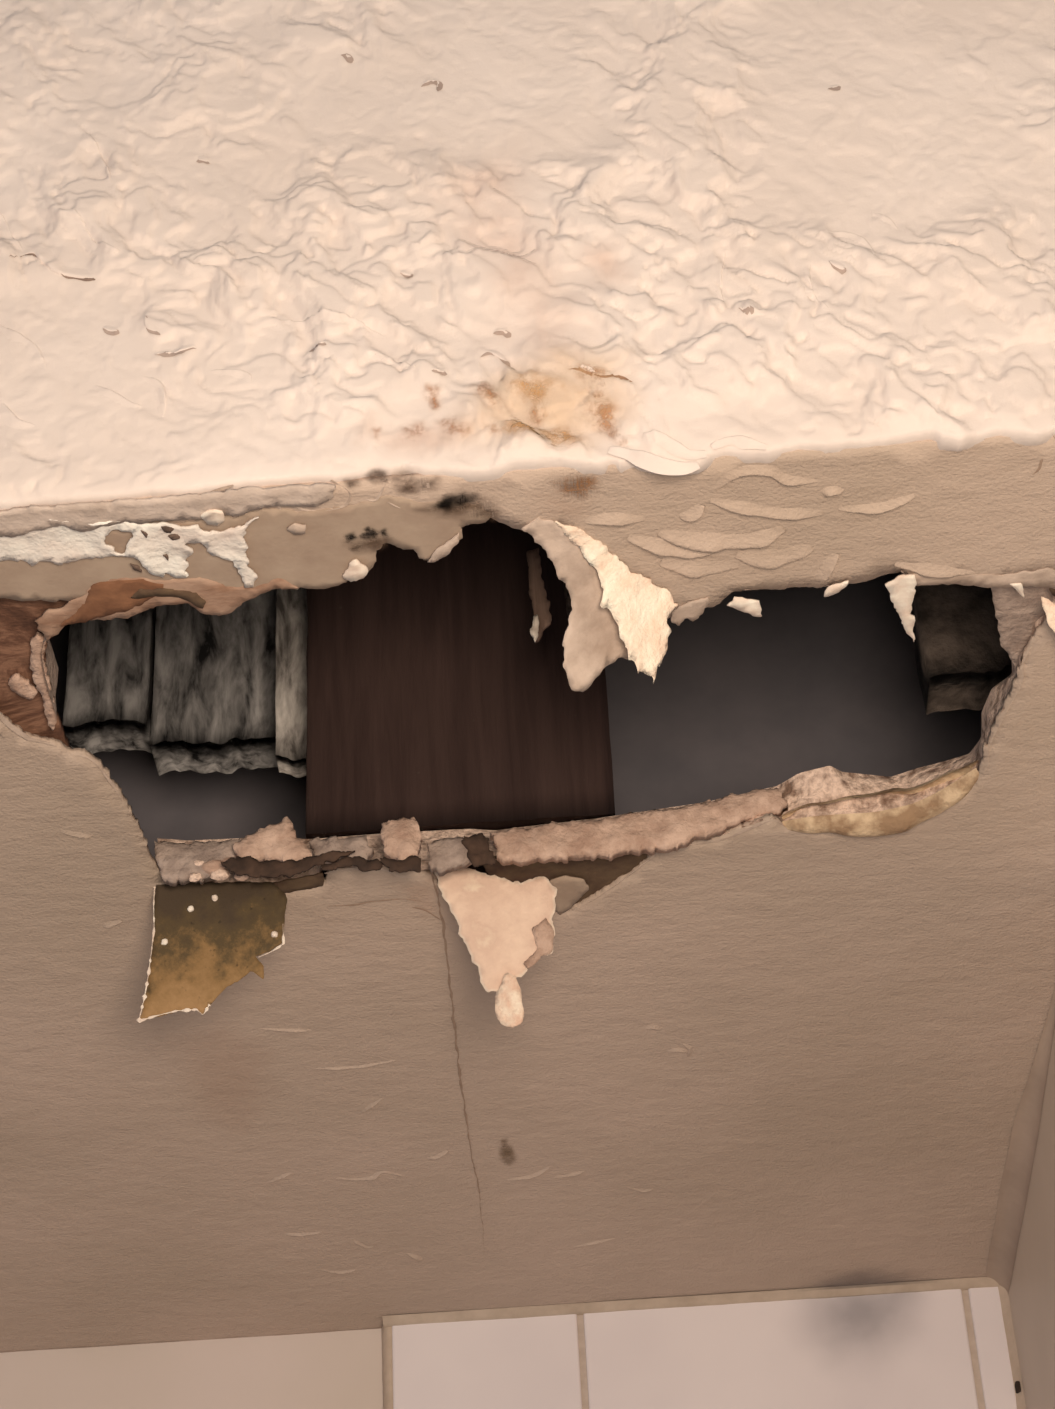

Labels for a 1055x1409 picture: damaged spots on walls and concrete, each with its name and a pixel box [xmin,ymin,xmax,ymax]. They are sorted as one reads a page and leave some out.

peeling [0,479,492,713]
spalling [127,567,1055,915]
crack [339,873,484,1245]